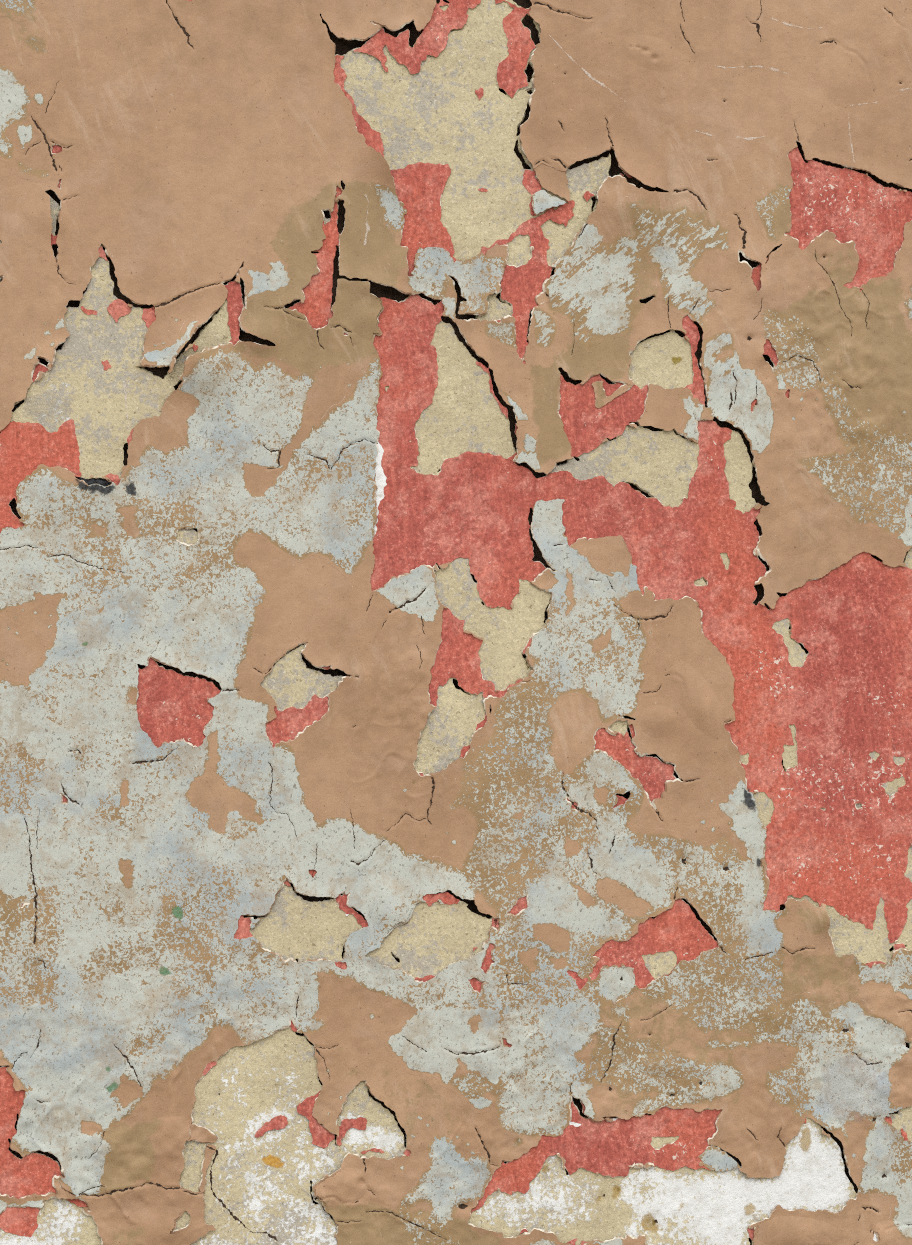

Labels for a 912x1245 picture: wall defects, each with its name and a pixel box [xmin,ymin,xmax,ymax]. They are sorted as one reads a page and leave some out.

crack [152,283,219,309]
crack [267,306,352,349]
peeling [320,0,668,364]
peeling [751,141,912,291]
peeling [0,244,478,1245]
peeling [284,197,912,1245]